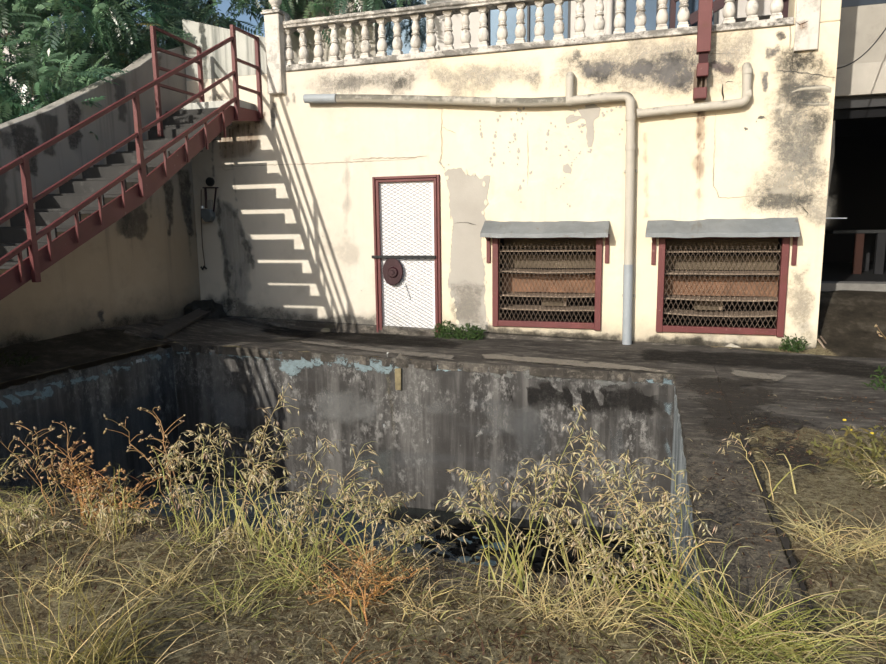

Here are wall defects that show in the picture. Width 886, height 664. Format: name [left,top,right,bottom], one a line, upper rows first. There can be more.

damp [8,112,57,175]
damp [68,101,82,148]
crack [223,114,455,171]
peeling [545,104,622,189]
crack [710,53,761,199]
damp [752,32,824,220]
damp [164,171,197,236]
peeling [439,107,527,332]
damp [208,231,460,348]
peeling [0,341,463,409]
damp [526,382,670,414]